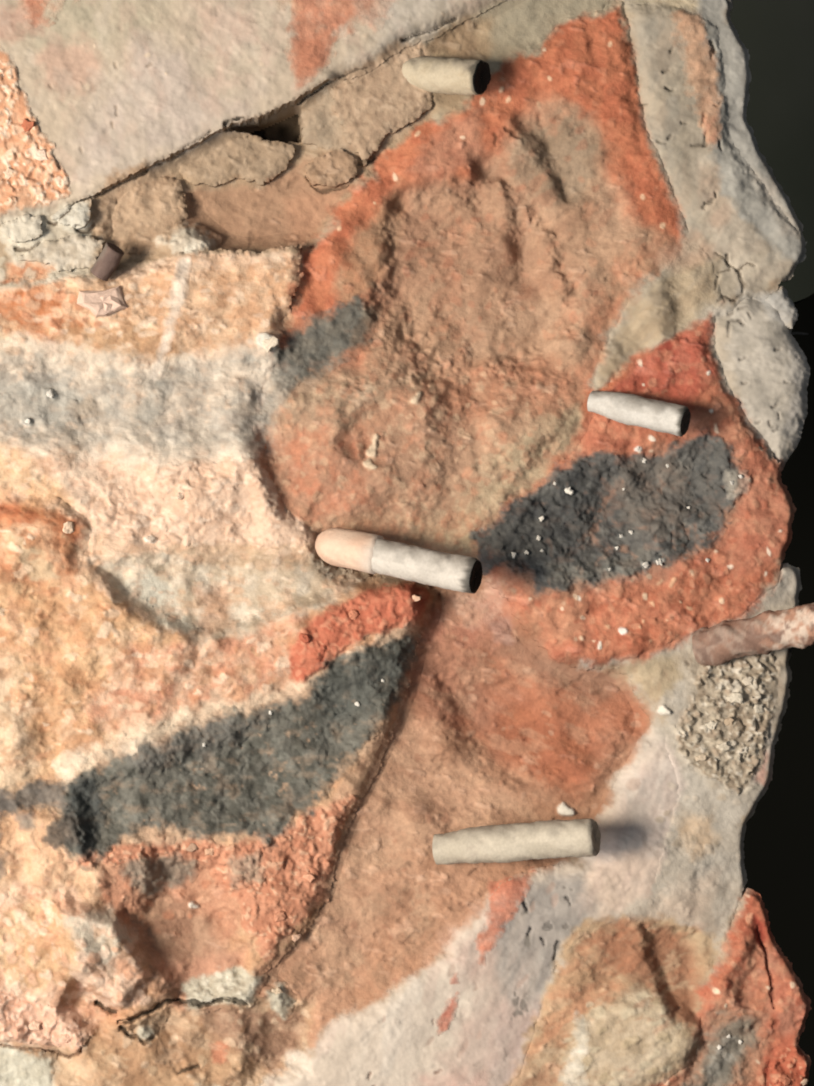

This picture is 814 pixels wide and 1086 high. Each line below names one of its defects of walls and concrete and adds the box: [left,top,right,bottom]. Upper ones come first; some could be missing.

crack [401,15,457,43]
crack [13,67,376,252]
crack [94,997,249,1046]
crack [177,1063,200,1074]